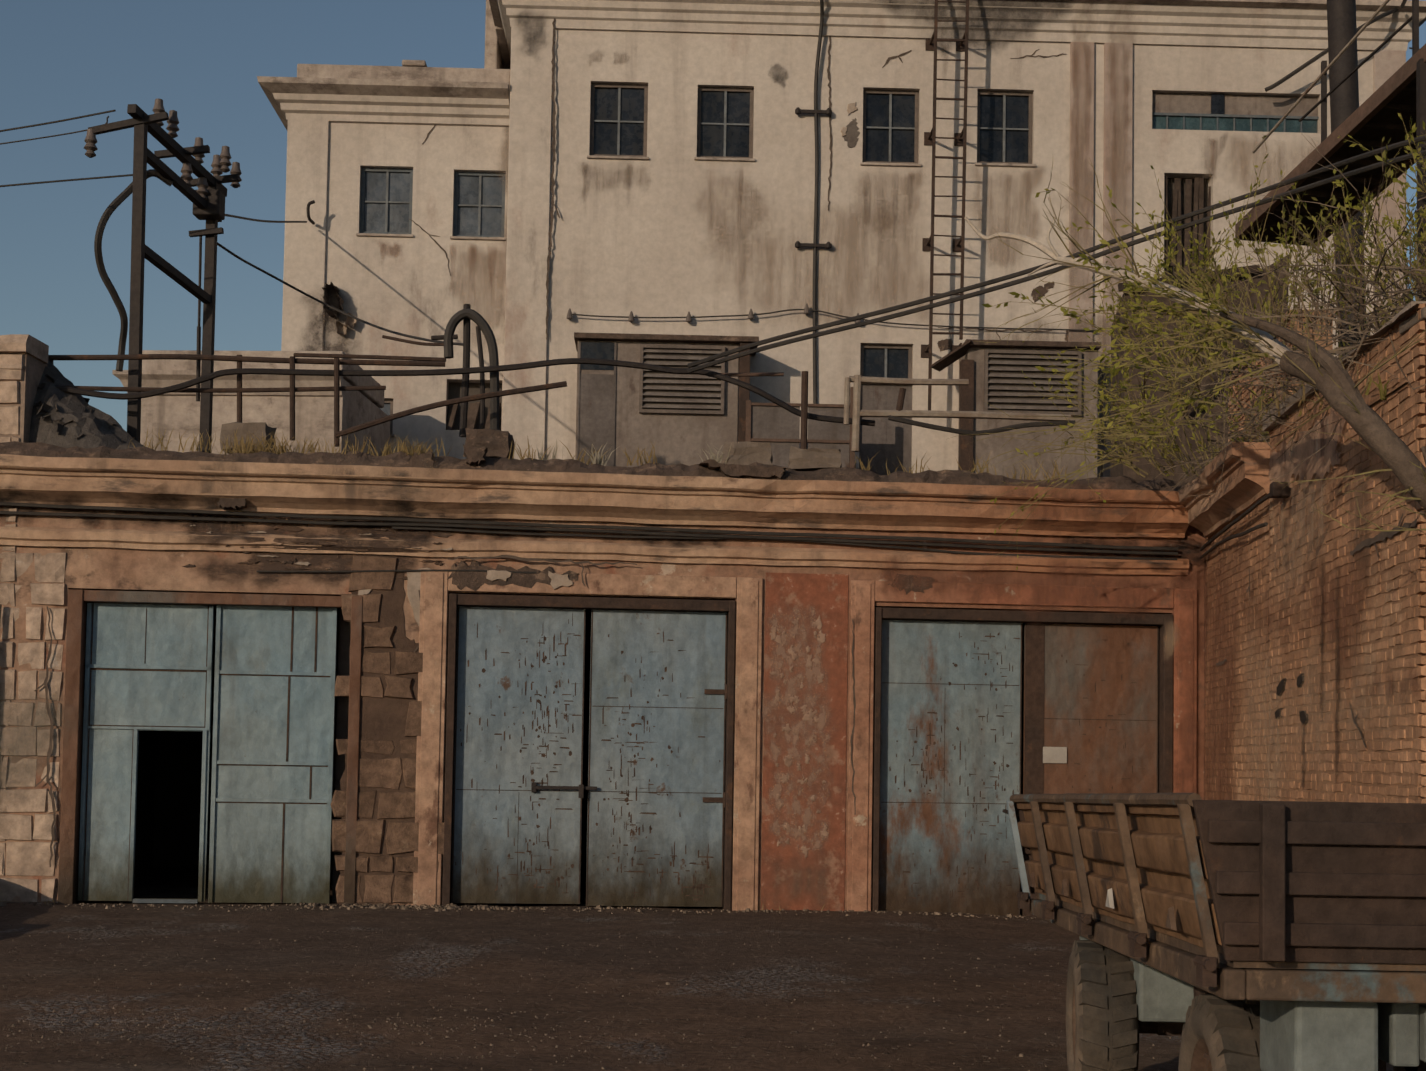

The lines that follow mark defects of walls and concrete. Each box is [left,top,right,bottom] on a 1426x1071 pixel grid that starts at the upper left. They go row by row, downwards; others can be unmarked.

flaking render [182,498,579,905]